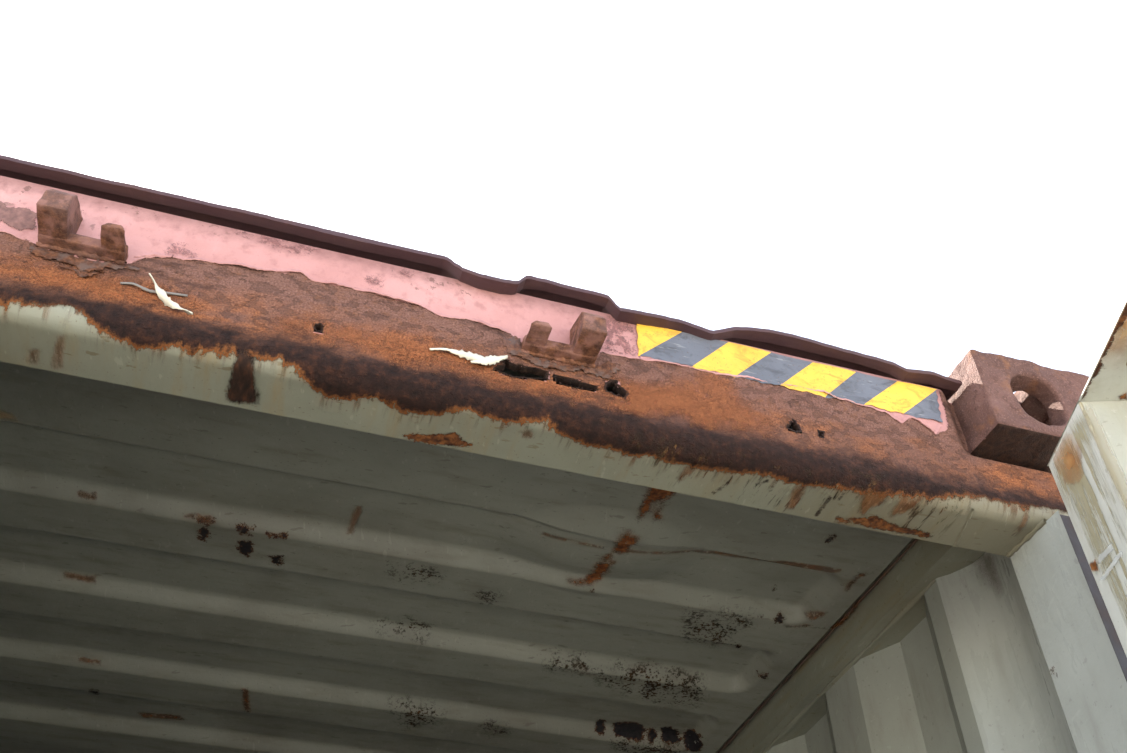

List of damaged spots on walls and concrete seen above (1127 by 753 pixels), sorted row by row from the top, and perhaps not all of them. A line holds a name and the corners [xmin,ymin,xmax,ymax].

corrosion [0,232,1079,538]
corrosion [1082,305,1127,399]
corrosion [544,532,681,586]
corrosion [695,551,841,572]